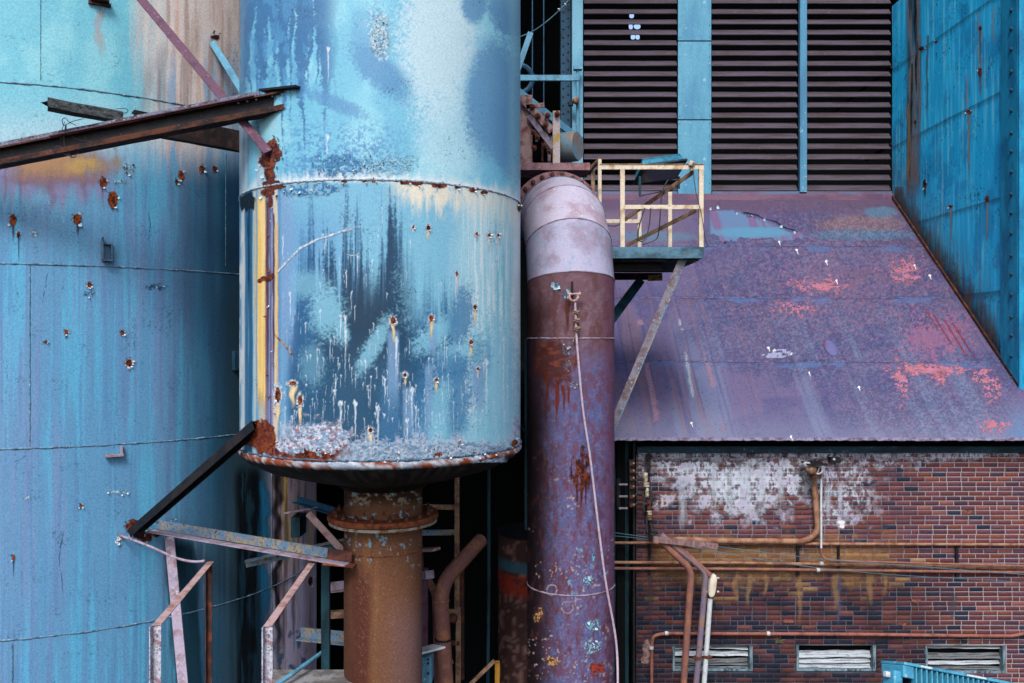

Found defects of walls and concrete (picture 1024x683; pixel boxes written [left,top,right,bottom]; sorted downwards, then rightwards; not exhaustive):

rust [17,153,120,209]
rust [400,179,489,195]
rust [895,0,1001,355]
rust [8,213,21,255]
rust [70,211,82,232]
rust [246,135,351,462]
rust [534,340,577,416]
rust [570,445,590,503]
damp [638,453,1019,527]